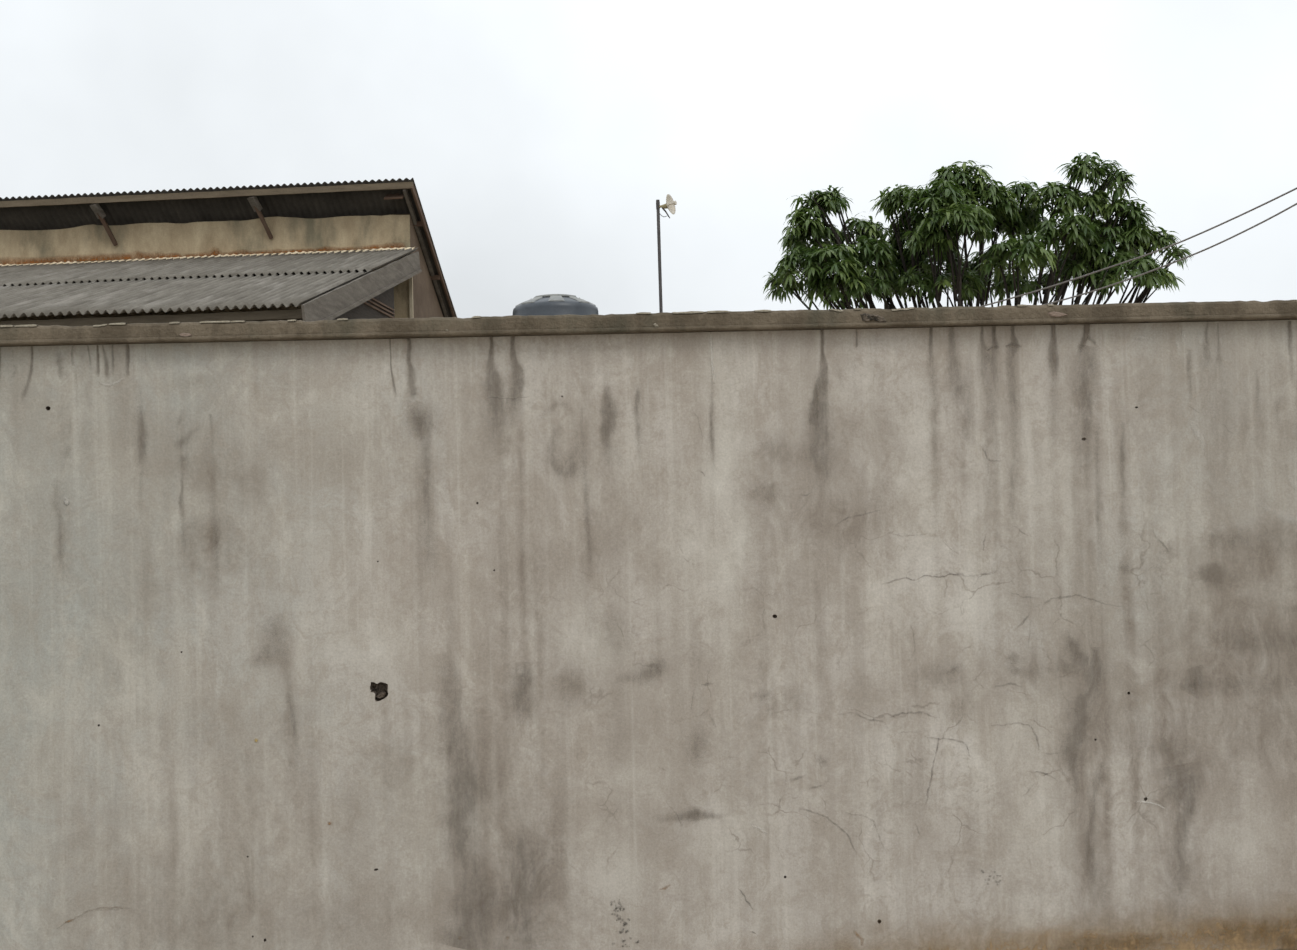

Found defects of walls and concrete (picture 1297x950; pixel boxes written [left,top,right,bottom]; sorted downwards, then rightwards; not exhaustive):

spalling [370,682,388,701]